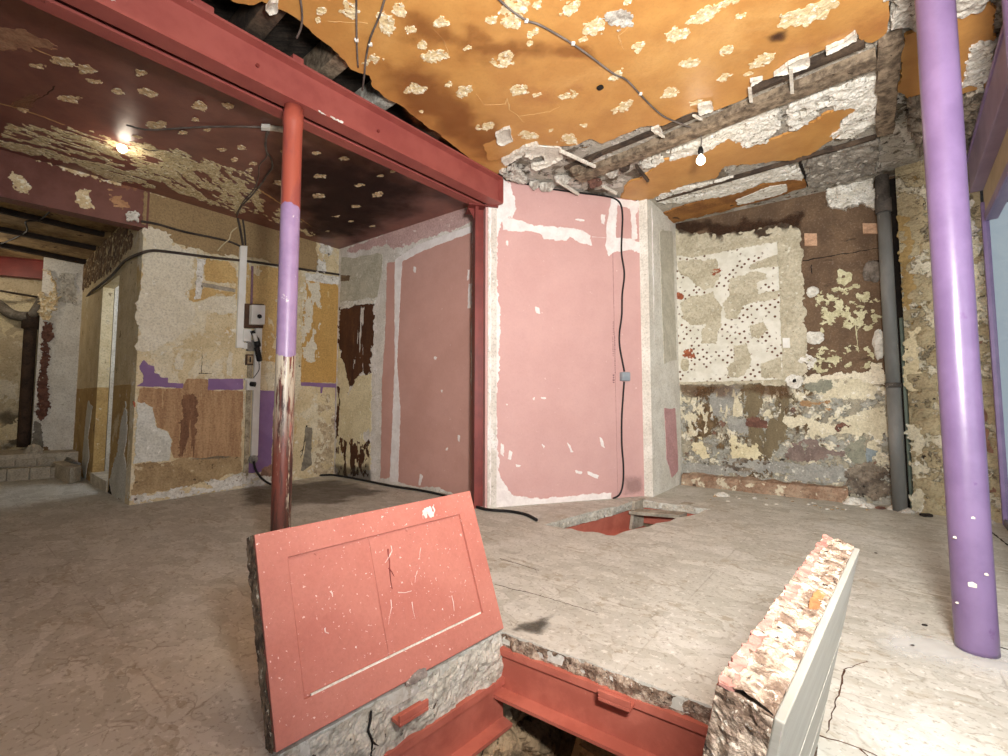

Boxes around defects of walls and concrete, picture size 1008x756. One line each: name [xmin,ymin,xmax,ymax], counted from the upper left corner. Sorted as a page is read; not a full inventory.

spalling [376,2,450,64]
spalling [578,0,634,43]
spalling [664,0,746,44]
flaking render [640,76,883,205]
peeling [0,108,280,362]
peeling [299,221,376,475]
spalling [677,236,779,344]
peeling [815,269,882,333]
flaking render [108,402,272,504]
flaking render [681,322,891,501]
crack [367,710,379,756]
crack [820,661,877,756]